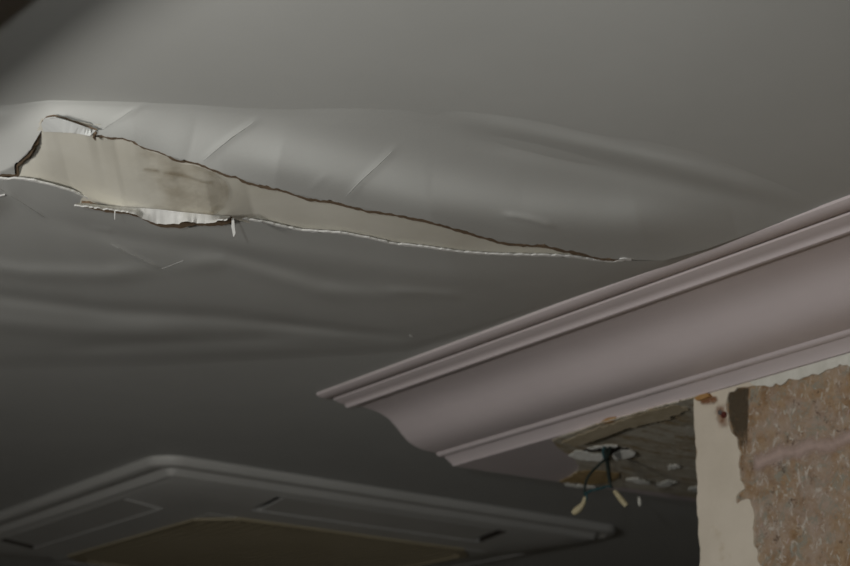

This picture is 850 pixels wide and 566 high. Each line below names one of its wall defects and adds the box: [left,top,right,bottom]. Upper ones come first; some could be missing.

peeling [552,396,698,506]
peeling [727,365,850,566]